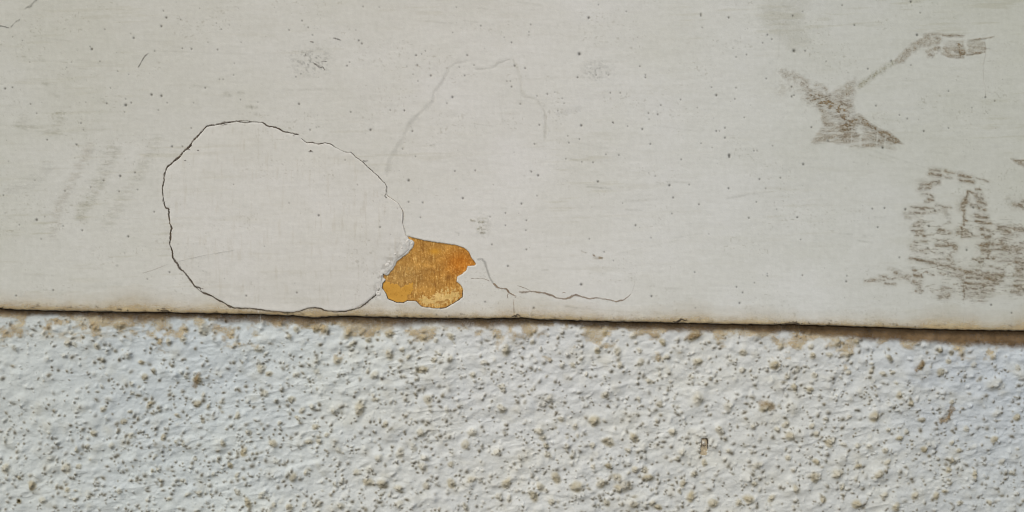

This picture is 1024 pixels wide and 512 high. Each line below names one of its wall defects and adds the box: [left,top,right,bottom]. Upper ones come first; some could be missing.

crack [162,120,406,313]
peeling [375,237,476,309]
crack [488,280,626,304]